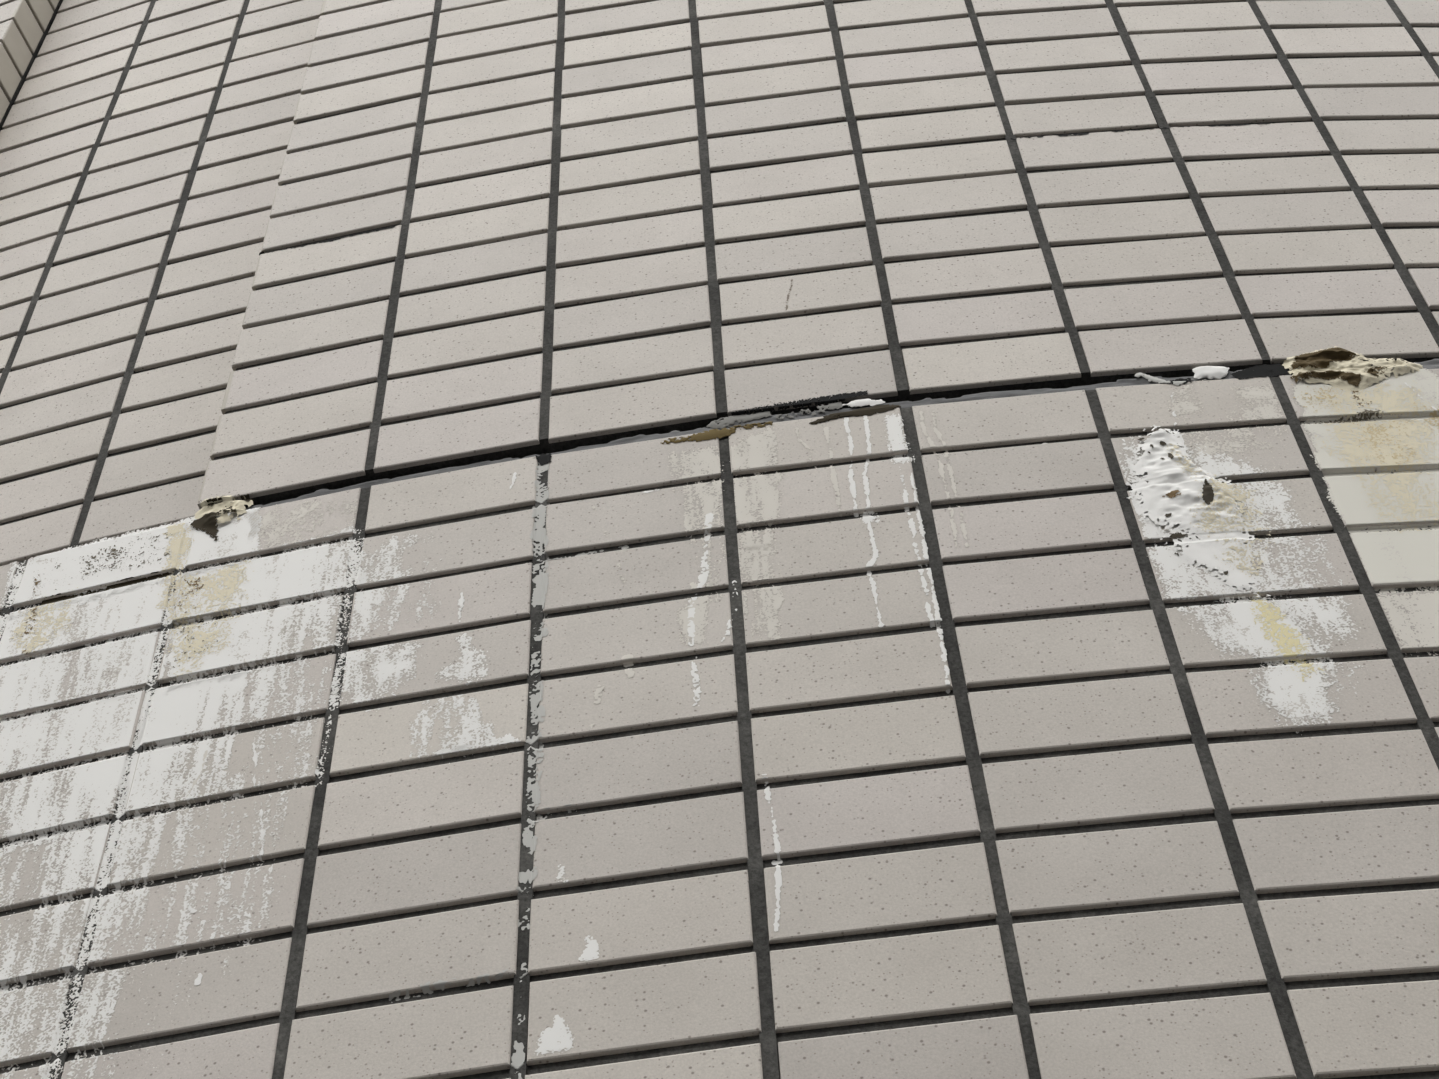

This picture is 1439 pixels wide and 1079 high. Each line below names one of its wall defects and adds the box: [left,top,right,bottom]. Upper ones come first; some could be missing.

spalling [190,494,253,541]
crack [731,390,868,416]
leakage [643,411,969,706]
leakage [1105,362,1439,727]
spalling [1282,346,1423,392]
leakage [0,463,629,1079]